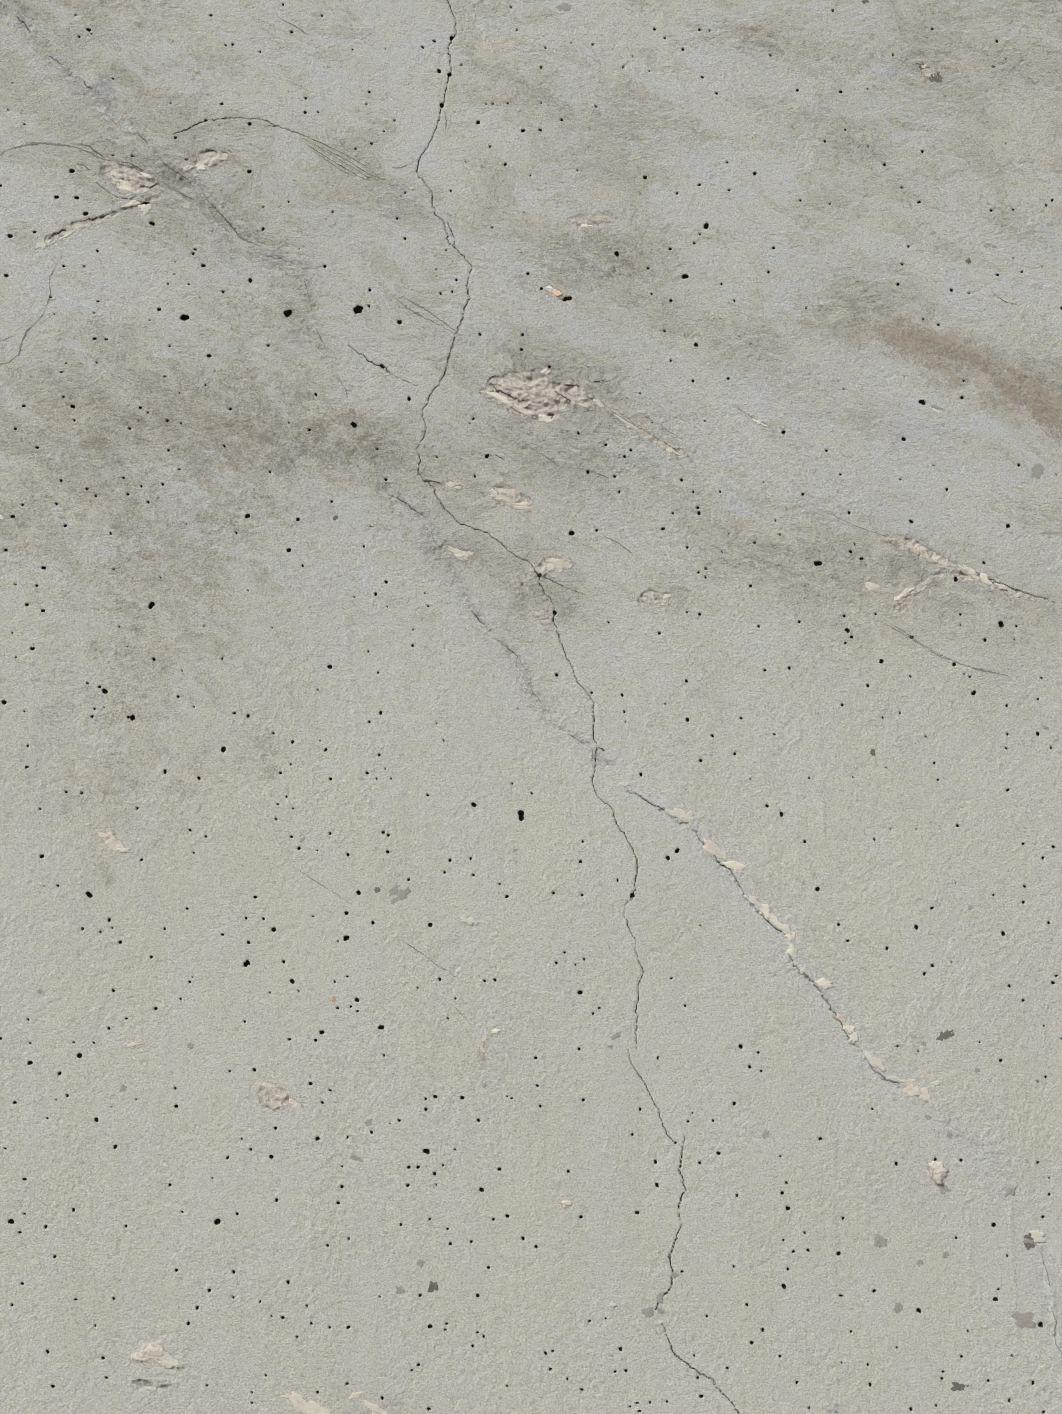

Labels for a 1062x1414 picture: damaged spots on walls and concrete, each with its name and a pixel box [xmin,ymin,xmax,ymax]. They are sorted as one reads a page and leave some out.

crack [0,256,62,363]
peeling [479,369,689,458]
crack [237,0,739,1414]
crack [1040,1253,1062,1354]
peeling [280,1391,332,1414]